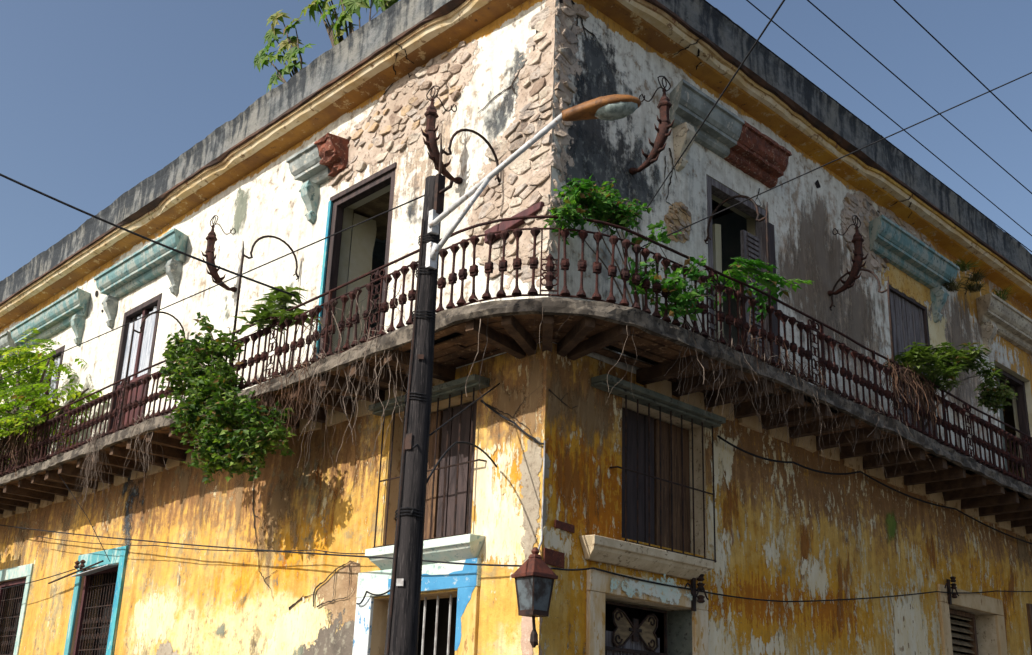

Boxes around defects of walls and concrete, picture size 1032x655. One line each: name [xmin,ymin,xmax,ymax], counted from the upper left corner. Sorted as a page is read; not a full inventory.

spalling [328,40,483,190]
spalling [466,0,590,293]
water stain [572,36,632,101]
water stain [555,126,661,220]
water stain [122,477,144,553]
peeling [260,562,360,655]
peeling [471,435,574,580]
peeling [706,434,738,588]
peeling [748,630,787,655]
peeling [763,535,780,568]
peeling [797,552,834,604]
peeling [890,585,929,655]